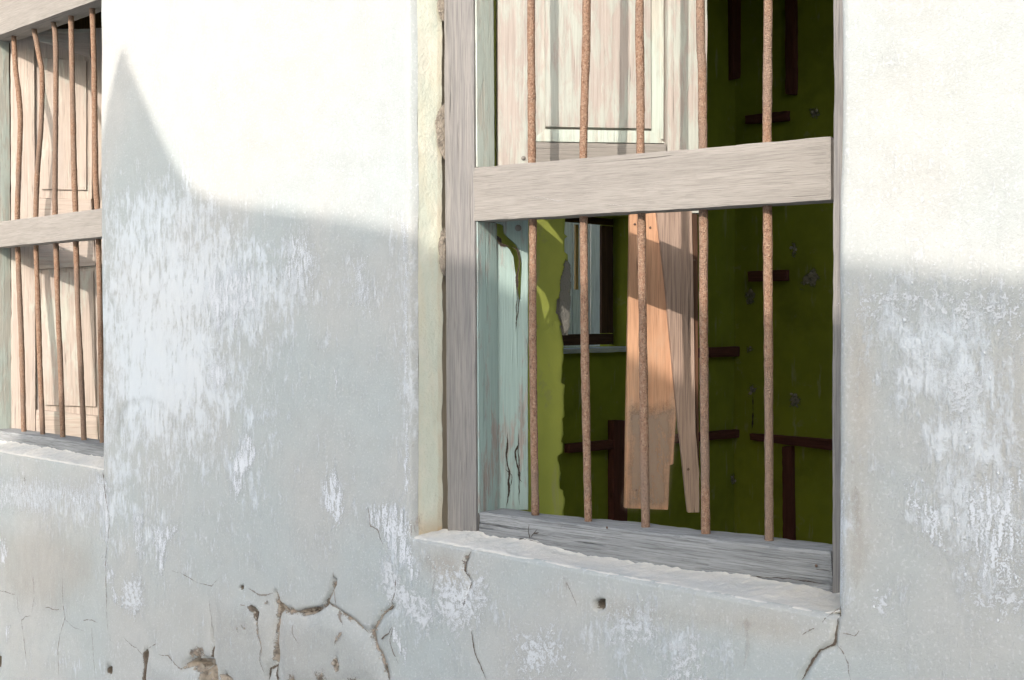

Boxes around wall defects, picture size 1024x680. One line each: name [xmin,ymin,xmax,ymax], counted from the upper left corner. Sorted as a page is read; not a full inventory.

crack [462,552,472,606]
spalling [181,647,233,680]
crack [242,576,396,680]
crack [802,608,859,680]